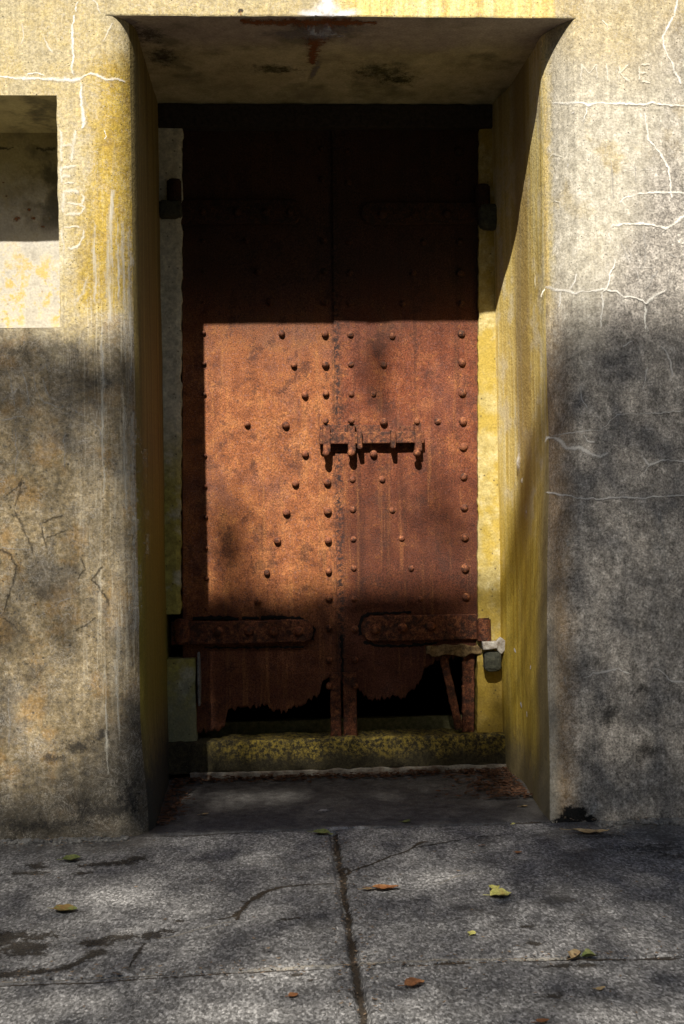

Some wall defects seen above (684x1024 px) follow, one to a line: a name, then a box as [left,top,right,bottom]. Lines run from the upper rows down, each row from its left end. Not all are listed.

crack [0,0,125,139]
corrosion [238,9,377,65]
crack [541,0,684,458]
crack [547,458,684,500]
corrosion [193,615,316,649]
crack [157,834,508,939]